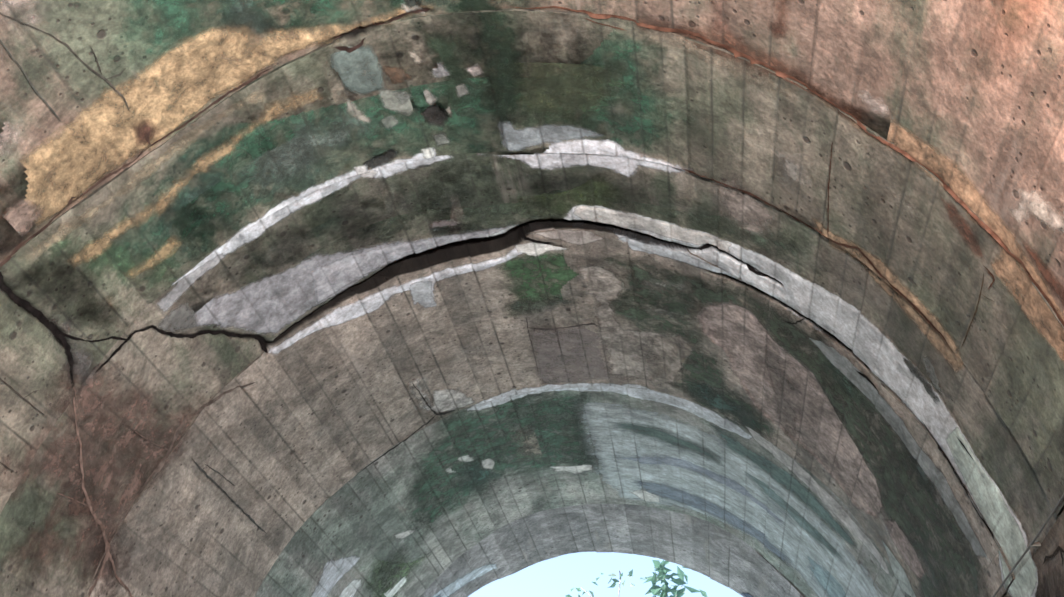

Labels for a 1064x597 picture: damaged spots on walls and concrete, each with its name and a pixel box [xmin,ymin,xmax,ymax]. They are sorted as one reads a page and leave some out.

crack [0,13,130,121]
crack [334,8,431,53]
leakage [427,34,463,106]
rust [5,7,429,263]
rust [130,240,178,276]
crack [0,62,558,597]
peeling [312,214,512,302]
peeling [579,265,692,385]
peeling [722,182,772,232]
rust [794,218,964,371]
rust [887,123,1064,360]
crack [1043,546,1064,566]